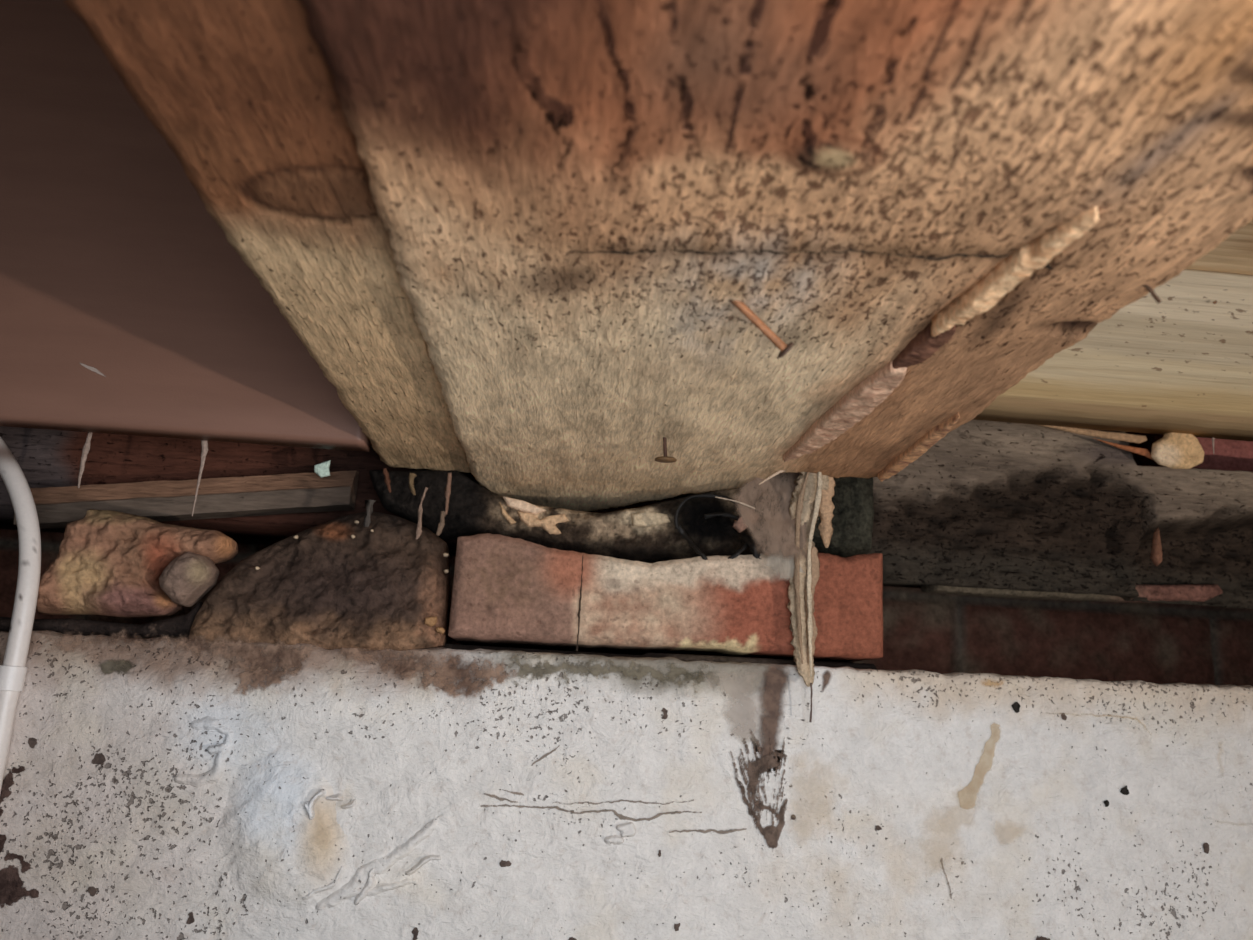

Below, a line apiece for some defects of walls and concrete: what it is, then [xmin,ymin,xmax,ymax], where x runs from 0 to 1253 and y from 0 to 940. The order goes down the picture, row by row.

damp [959,724,1000,809]
crack [481,789,746,834]